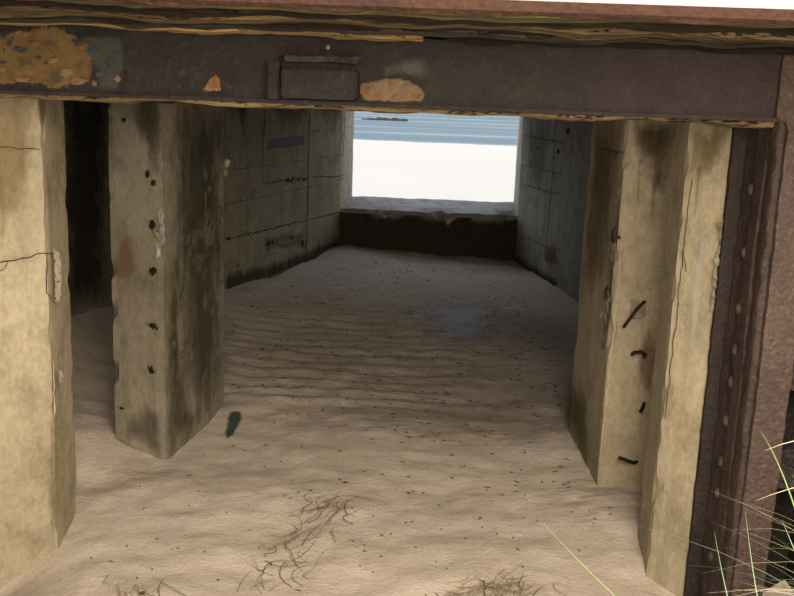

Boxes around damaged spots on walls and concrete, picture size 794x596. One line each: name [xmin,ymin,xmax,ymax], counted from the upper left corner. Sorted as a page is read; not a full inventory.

peeling [0,25,125,91]
peeling [203,75,221,91]
peeling [360,78,424,102]
damp [639,126,668,184]
crack [0,253,55,304]